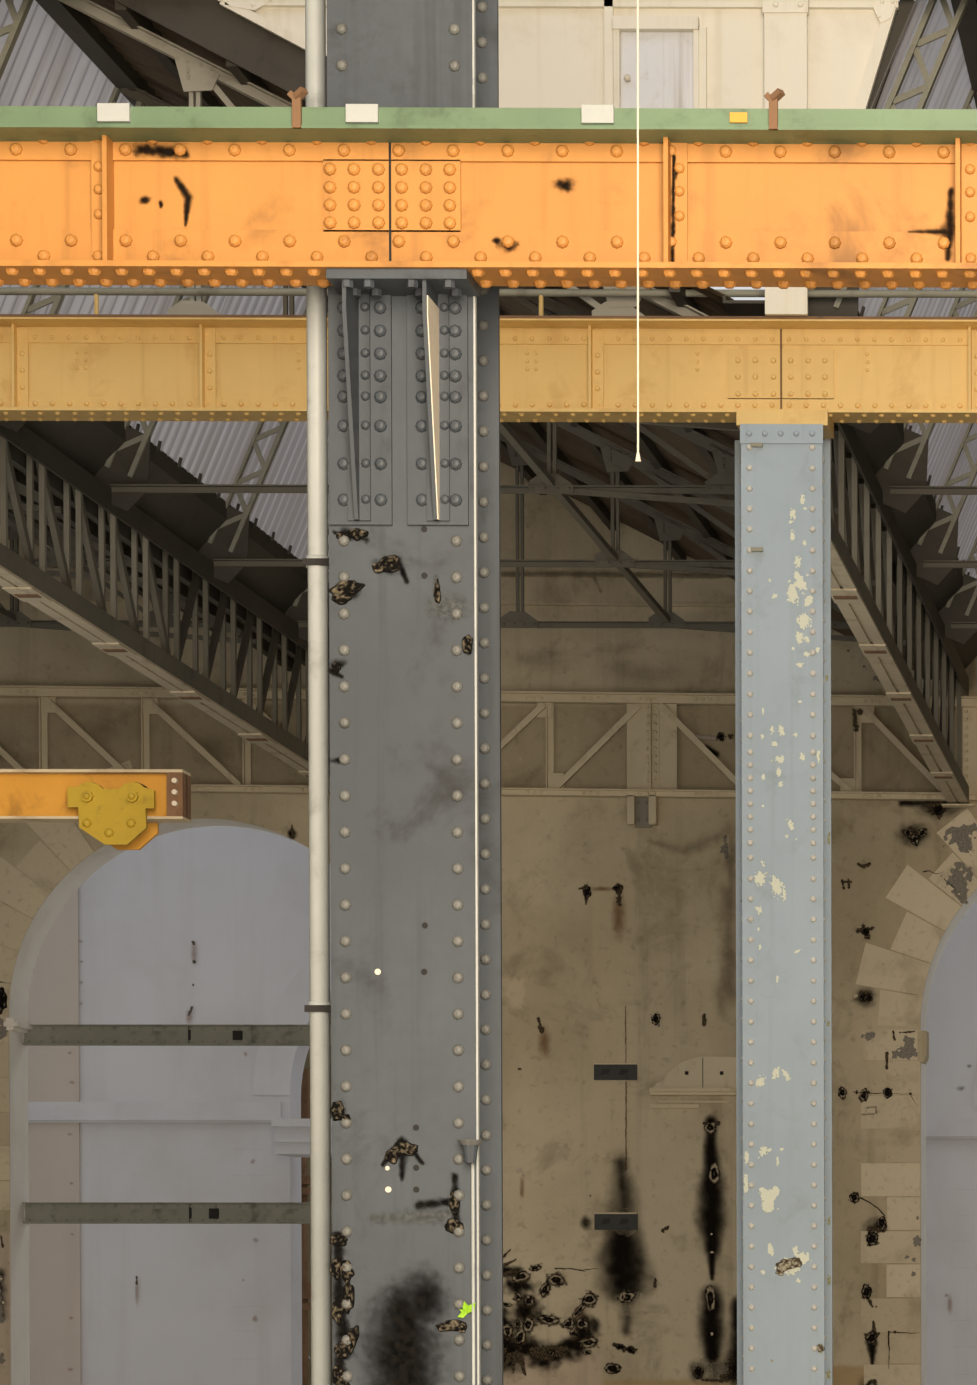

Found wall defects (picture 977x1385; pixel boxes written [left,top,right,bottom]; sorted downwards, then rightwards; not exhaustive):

peeling [768,494,820,668]
peeling [760,708,820,787]
peeling [899,801,977,904]
peeling [754,859,787,950]